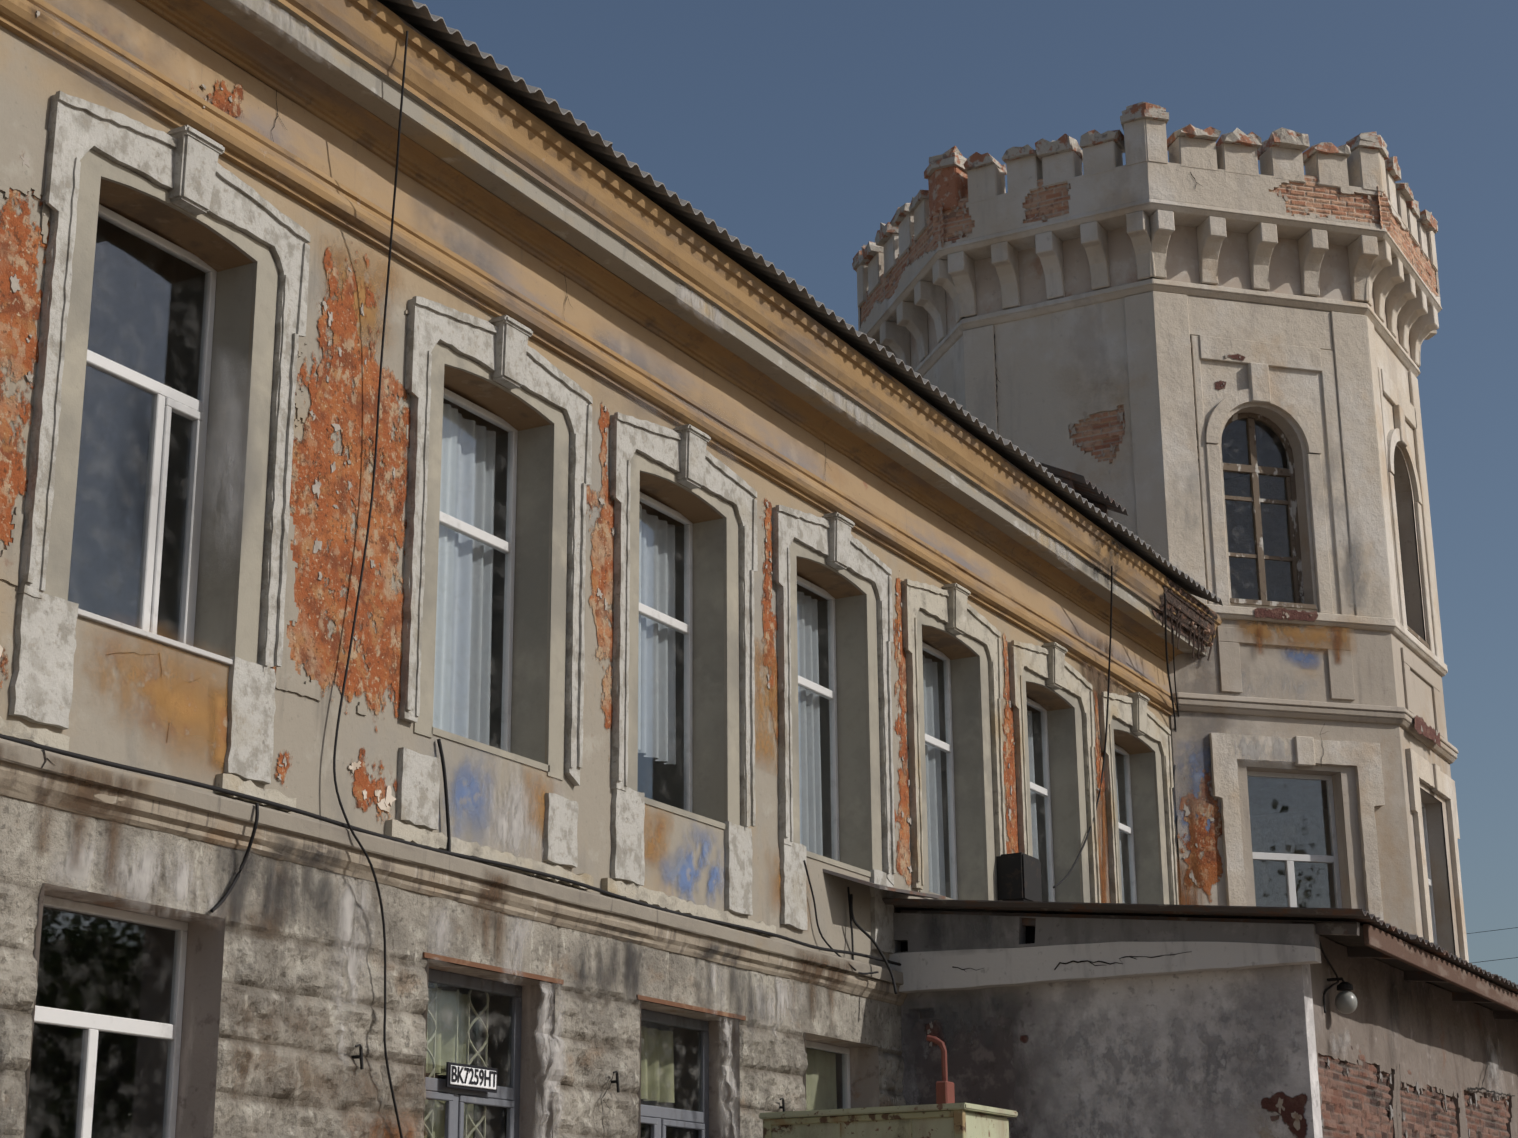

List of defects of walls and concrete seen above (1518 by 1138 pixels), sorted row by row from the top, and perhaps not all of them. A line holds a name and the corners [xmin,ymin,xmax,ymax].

spalling [1269,175,1438,296]
peeling [0,188,50,548]
peeling [272,246,411,733]
peeling [586,404,615,729]
peeling [760,499,779,750]
rust [1244,621,1350,662]
damp [41,766,193,900]
peeling [348,747,398,821]
peeling [891,577,913,886]
rust [1177,801,1196,905]
damp [341,887,365,991]
spalling [1261,1046,1510,1138]